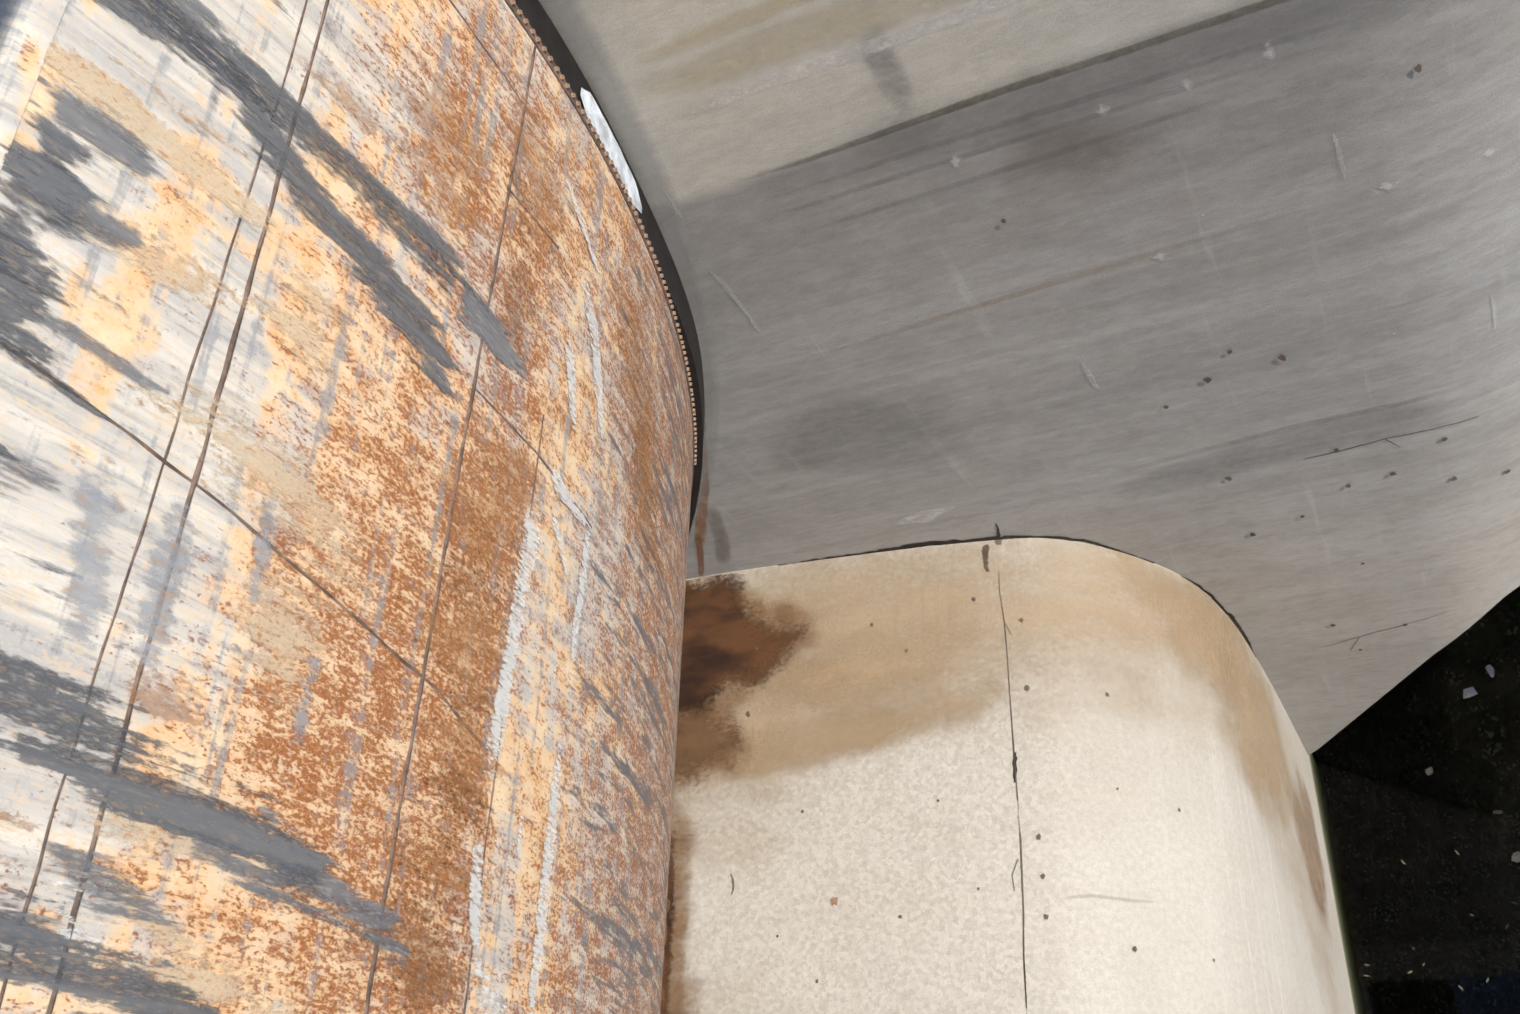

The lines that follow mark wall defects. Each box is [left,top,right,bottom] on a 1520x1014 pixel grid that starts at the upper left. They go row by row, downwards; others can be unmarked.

water stain [674,553,1235,781]
rust [660,821,687,1014]